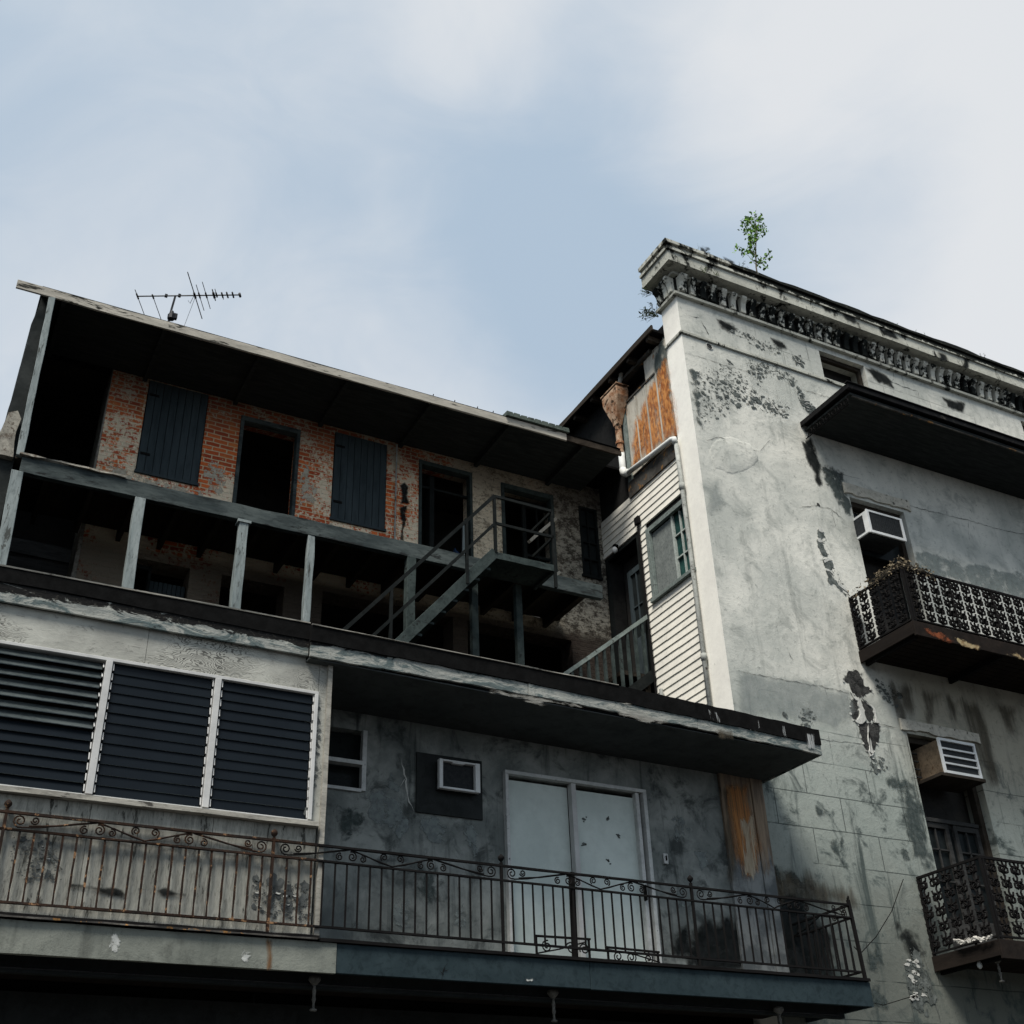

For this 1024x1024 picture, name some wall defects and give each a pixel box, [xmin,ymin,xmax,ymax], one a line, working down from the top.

peeling [695,328,816,422]
rust [632,364,676,465]
peeling [107,460,226,496]
damp [802,438,852,514]
spalling [816,528,849,596]
peeling [613,703,665,722]
spalling [842,669,902,774]
damp [340,809,364,840]
crack [401,765,413,808]
rust [726,784,759,879]
damp [887,776,933,868]
damp [71,884,125,896]